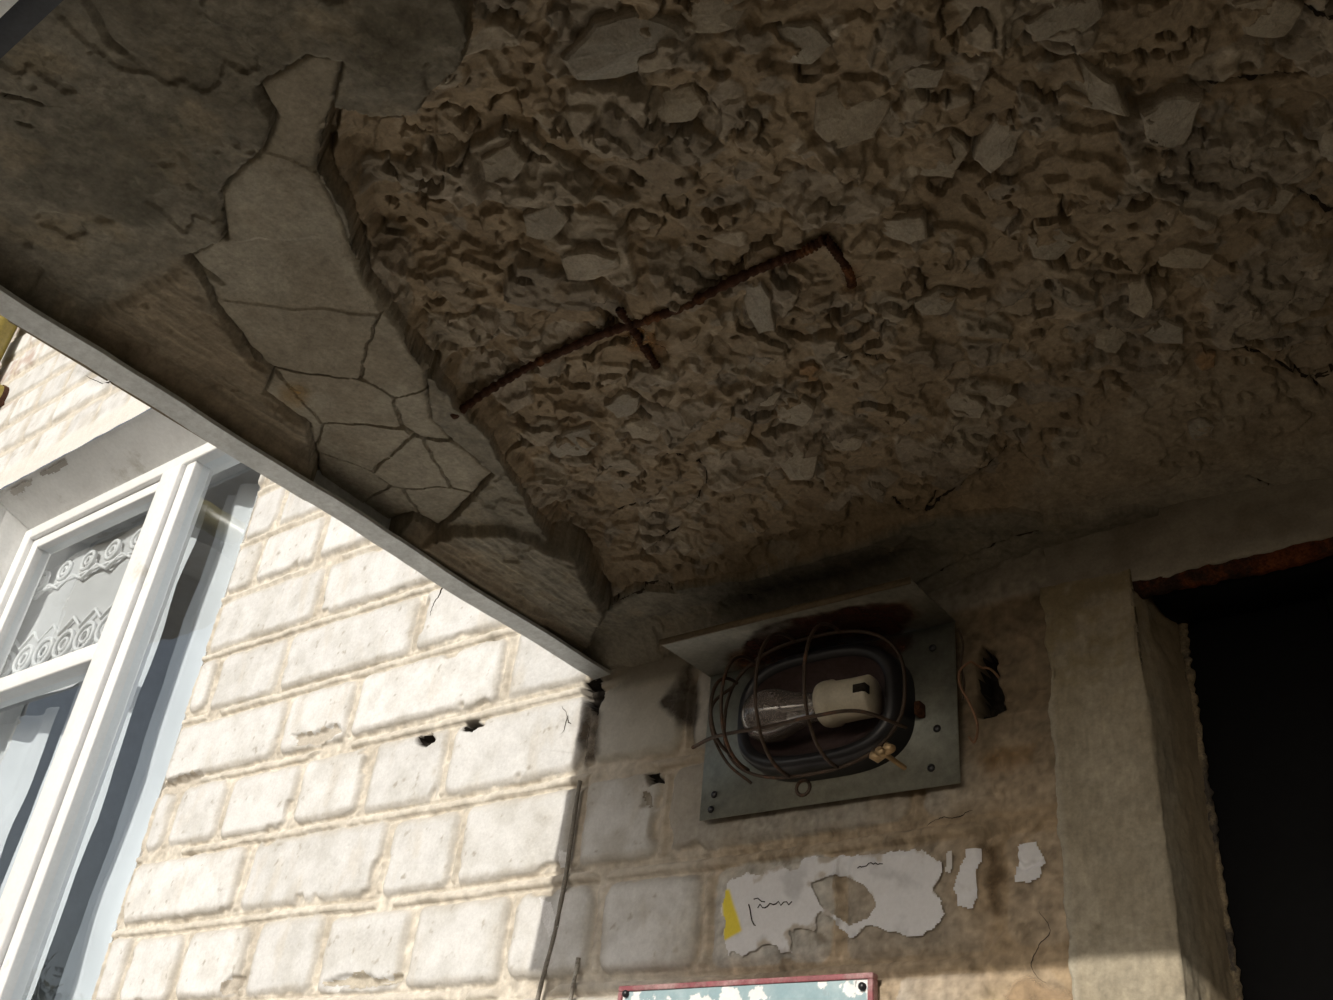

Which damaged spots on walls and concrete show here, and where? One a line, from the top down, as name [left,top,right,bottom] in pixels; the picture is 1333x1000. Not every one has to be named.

spalling [193,0,1333,596]